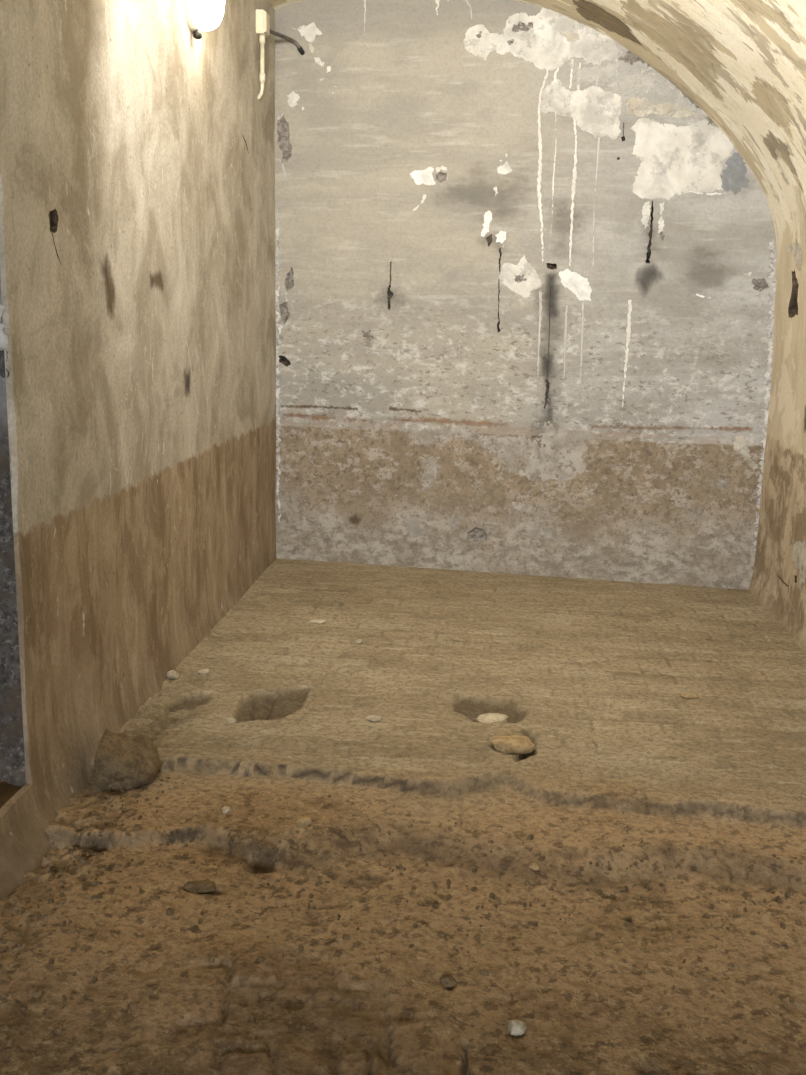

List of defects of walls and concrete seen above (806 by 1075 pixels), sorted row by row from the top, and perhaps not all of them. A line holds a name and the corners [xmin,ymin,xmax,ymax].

flaking render [739,0,800,43]
flaking render [409,166,448,211]
damp [536,59,581,267]
flaking render [463,0,734,233]
flaking render [0,305,9,351]
flaking render [481,211,557,332]
damp [532,275,584,447]